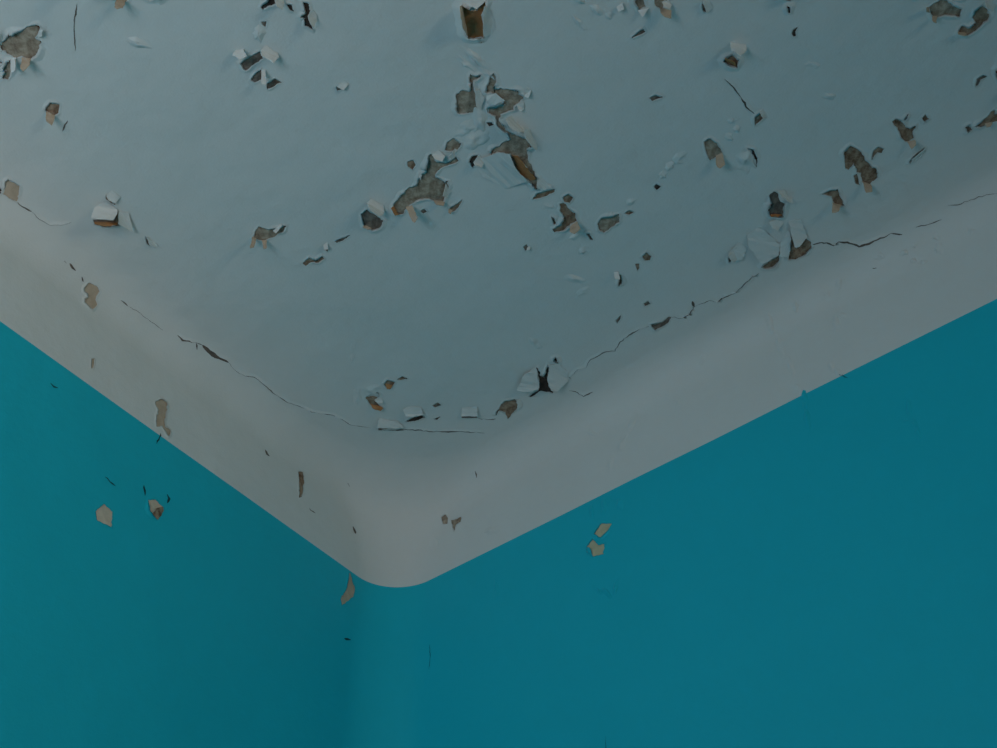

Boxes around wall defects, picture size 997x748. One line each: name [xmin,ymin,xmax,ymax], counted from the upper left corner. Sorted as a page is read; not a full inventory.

peeling [0,20,47,82]
peeling [232,45,284,92]
peeling [452,0,496,44]
peeling [911,0,996,39]
peeling [300,70,636,268]
peeling [838,142,886,193]
peeling [90,190,160,248]
peeling [725,189,815,272]
crack [813,220,940,269]
crack [671,273,761,319]
crack [121,300,496,433]
peeling [493,354,568,420]